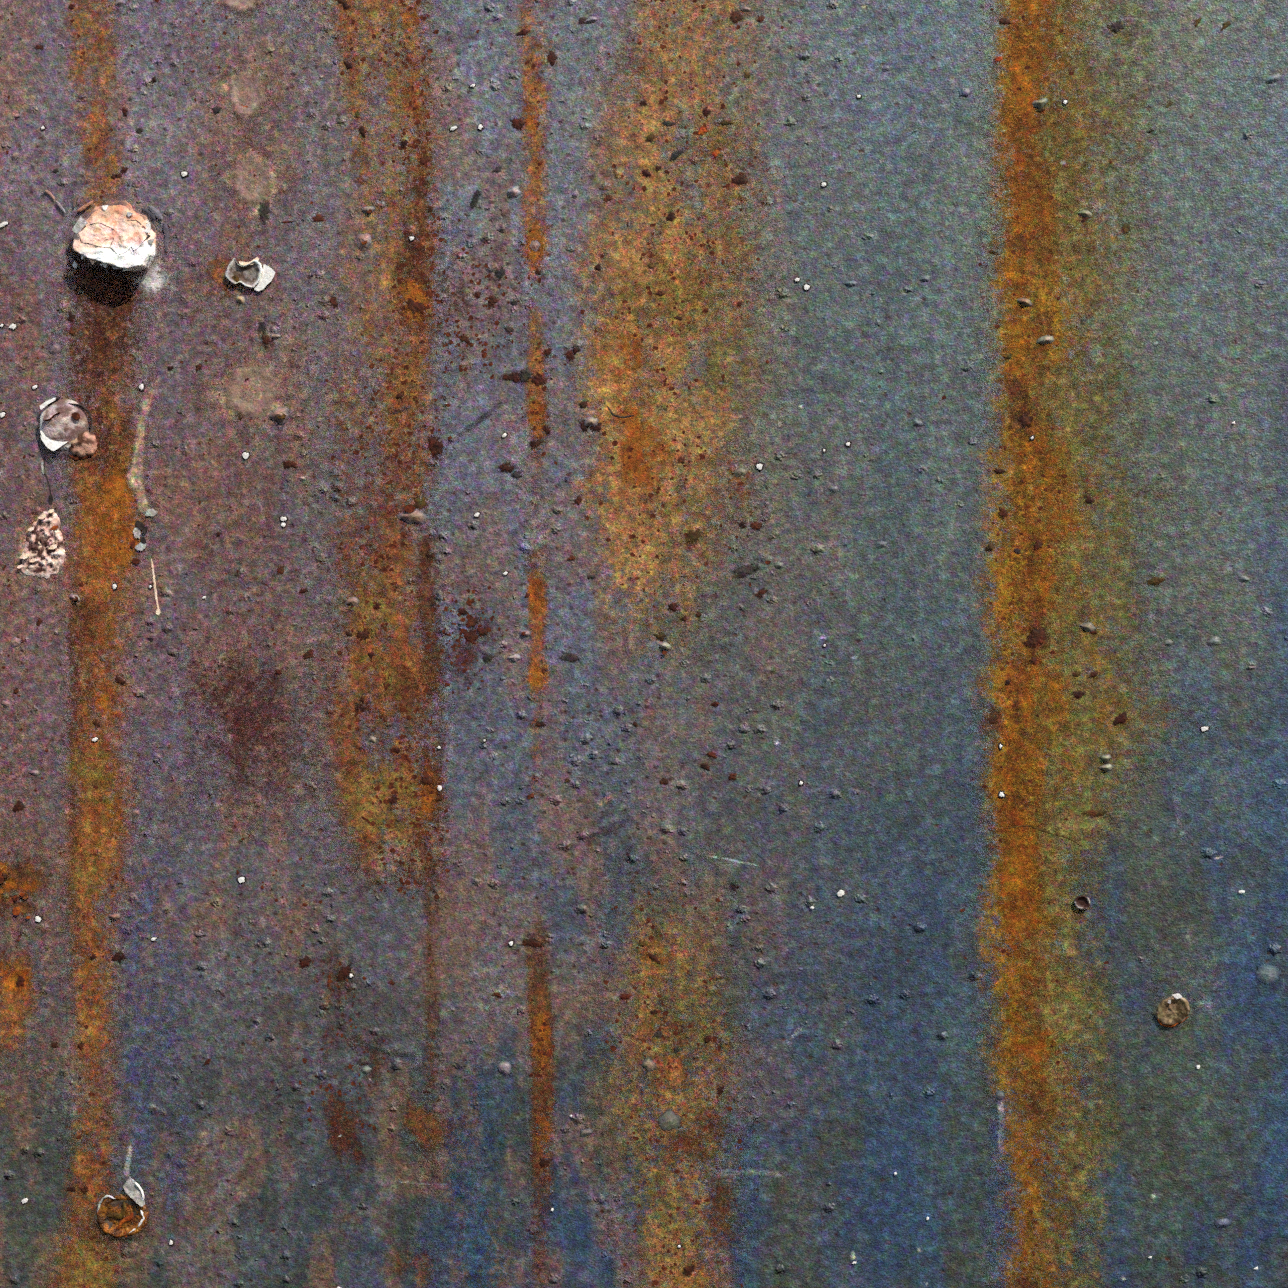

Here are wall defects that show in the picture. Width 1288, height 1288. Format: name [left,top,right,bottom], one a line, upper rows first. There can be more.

corrosion [69,0,126,216]
corrosion [180,2,250,186]
peeling [207,257,275,292]
corrosion [563,0,785,634]
peeling [16,509,67,580]
corrosion [0,267,151,1288]
corrosion [192,412,319,799]
corrosion [249,801,323,933]
corrosion [307,0,557,1088]
corrosion [969,0,1151,1288]
corrosion [526,928,556,1286]
corrosion [596,891,742,1288]